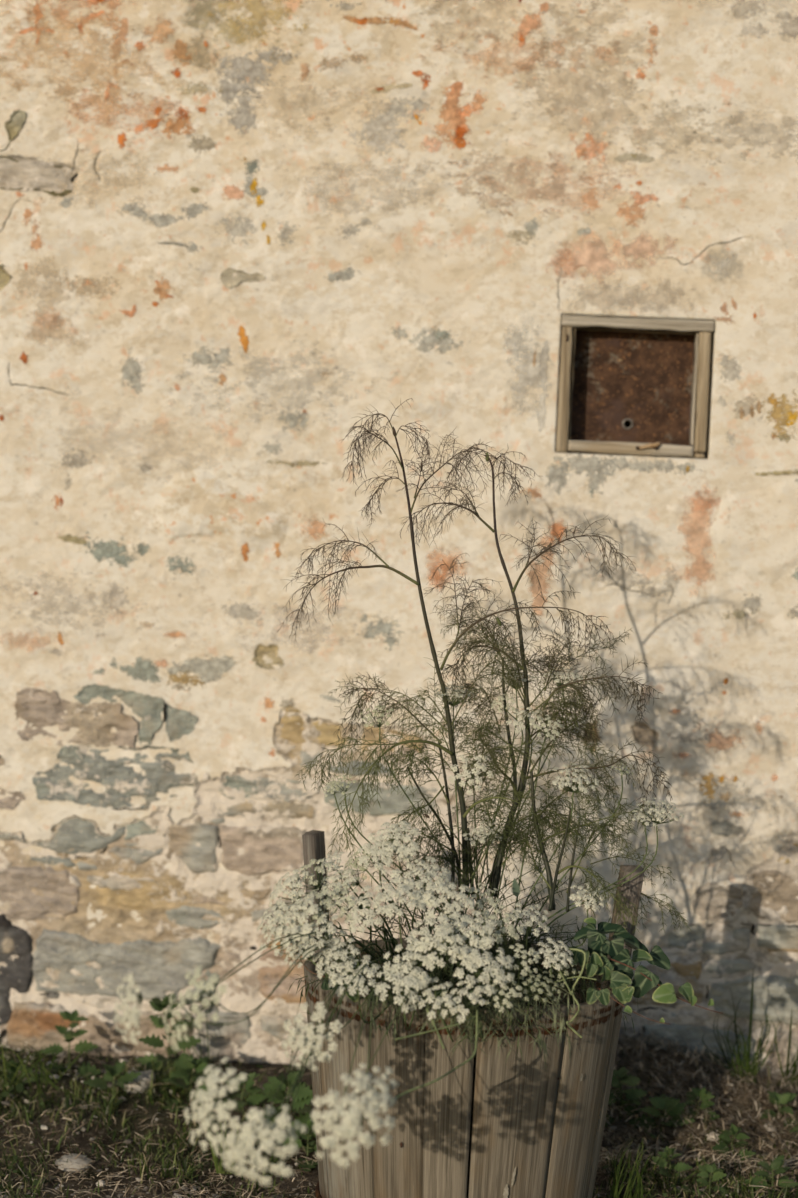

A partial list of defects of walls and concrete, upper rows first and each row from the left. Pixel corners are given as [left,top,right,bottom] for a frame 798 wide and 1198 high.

peeling [101,583,128,614]
spalling [252,644,284,670]
spalling [630,721,709,748]
spalling [0,655,487,1066]
peeling [701,820,745,864]
spalling [619,828,798,1081]